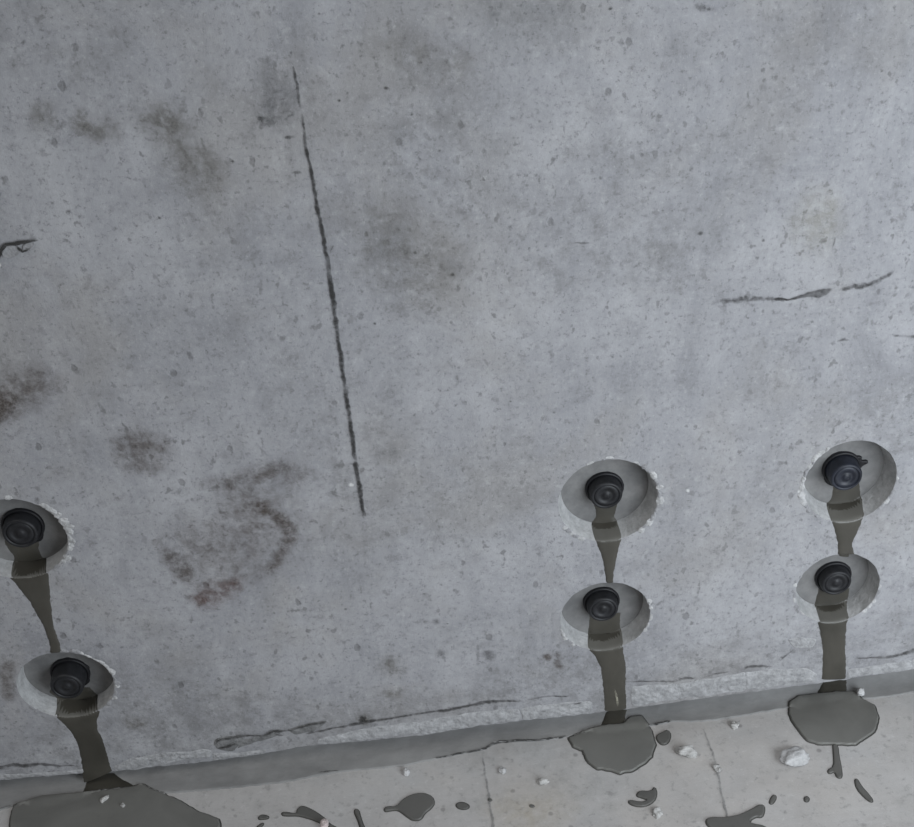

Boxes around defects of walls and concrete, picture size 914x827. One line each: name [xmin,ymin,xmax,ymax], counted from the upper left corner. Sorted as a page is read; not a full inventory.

peeling [0,240,37,258]
crack [287,123,365,514]
crack [726,274,891,302]
water stain [591,505,621,583]
water stain [827,484,864,557]
water stain [5,540,60,653]
water stain [787,588,880,779]